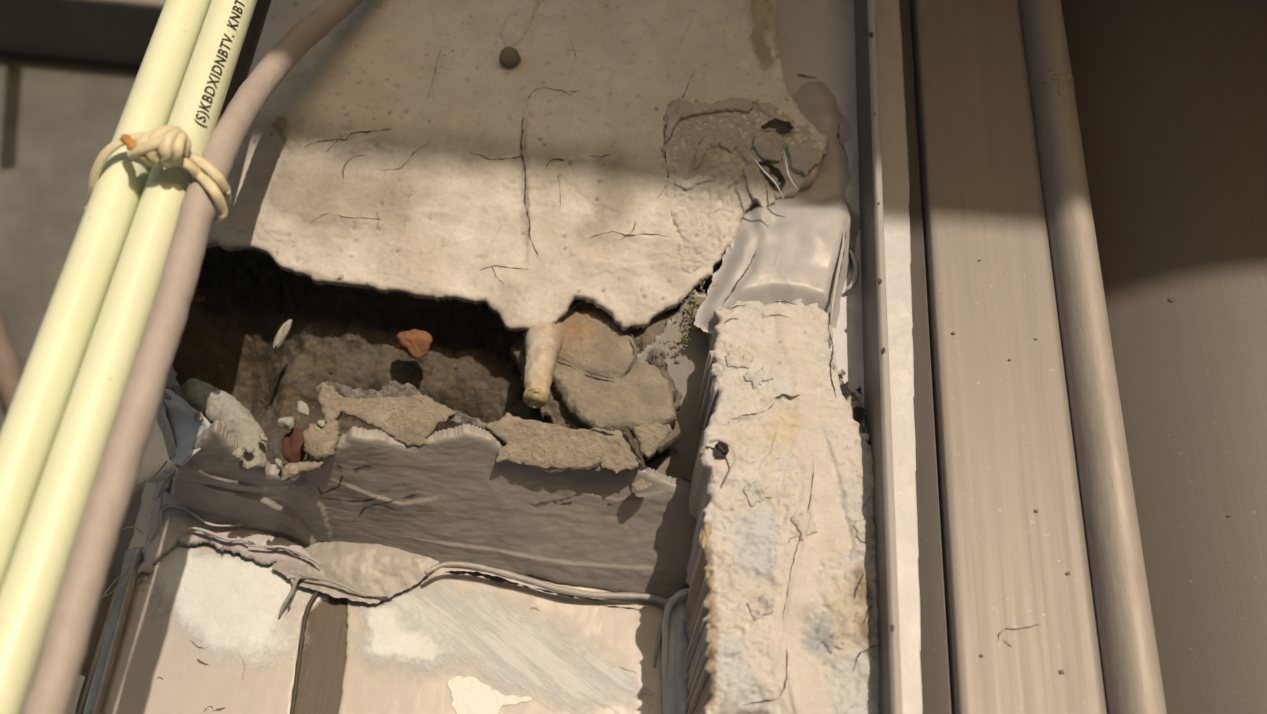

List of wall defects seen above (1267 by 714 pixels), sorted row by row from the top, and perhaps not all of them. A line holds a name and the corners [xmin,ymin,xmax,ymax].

crack [311,212,381,227]
crack [304,129,426,176]
crack [471,87,611,285]
peeling [662,98,827,299]
spalling [172,246,679,492]